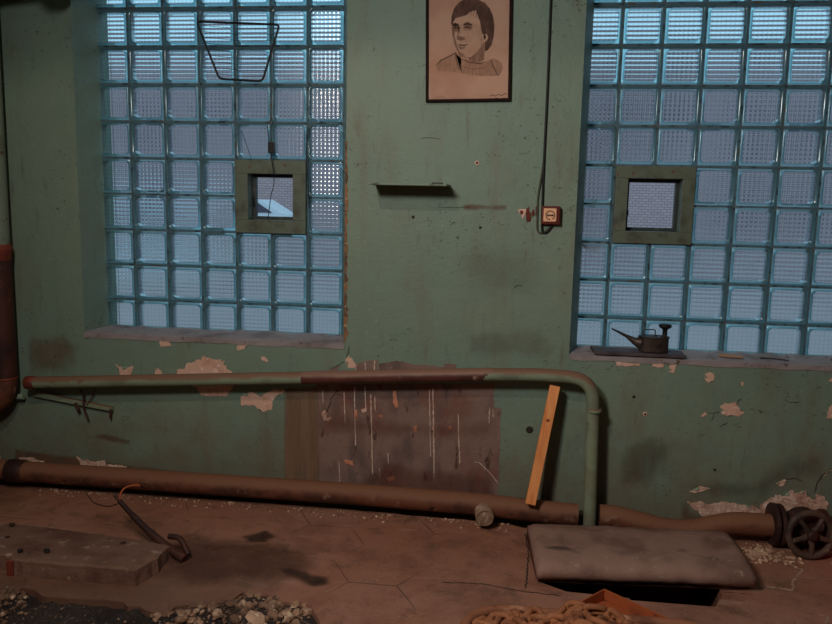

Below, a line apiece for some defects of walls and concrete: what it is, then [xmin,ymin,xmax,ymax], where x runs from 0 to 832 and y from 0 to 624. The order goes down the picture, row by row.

peeling [174,356,232,374]
peeling [193,385,234,396]
peeling [241,389,285,412]
peeling [720,402,744,417]
flaking render [687,480,829,516]